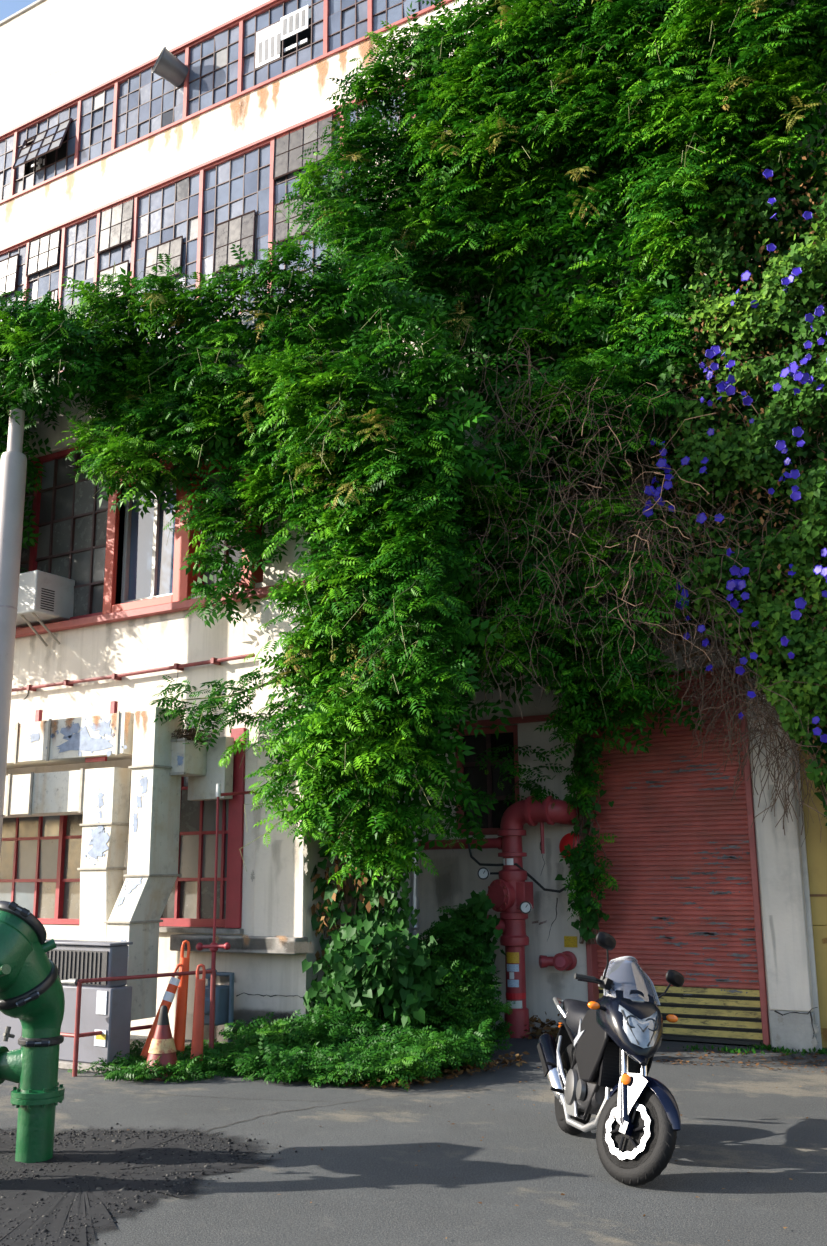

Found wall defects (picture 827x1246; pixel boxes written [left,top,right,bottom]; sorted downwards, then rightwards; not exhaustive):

corrosion [317,39,378,86]
corrosion [230,81,279,125]
corrosion [40,718,74,734]
peeling [29,718,127,756]
corrosion [94,711,147,733]
peeling [84,788,110,865]
peeling [117,878,142,907]